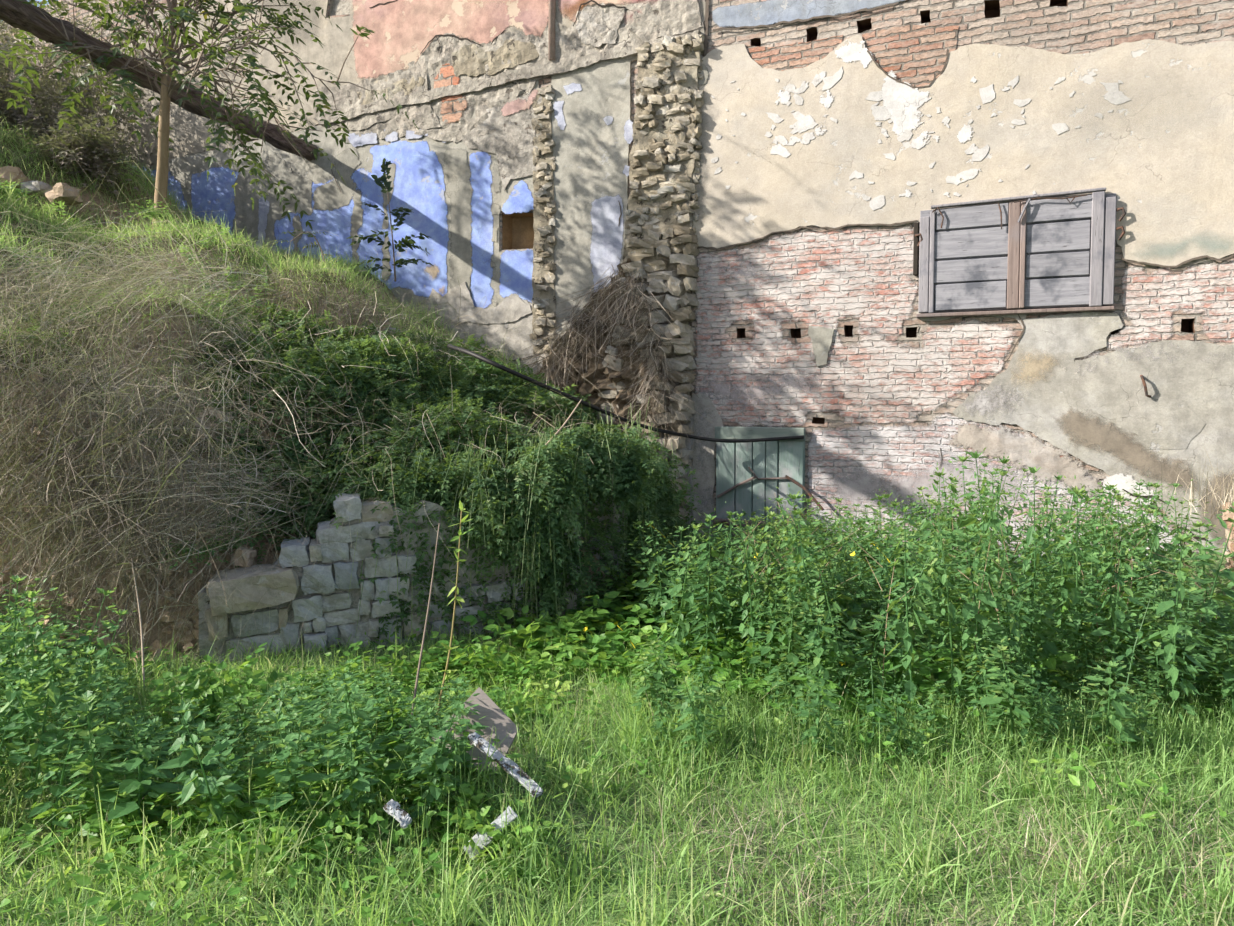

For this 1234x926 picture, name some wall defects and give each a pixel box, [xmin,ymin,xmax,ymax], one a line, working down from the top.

flaking render [576,0,702,48]
flaking render [748,24,1031,197]
peeling [849,170,917,210]
flaking render [424,265,532,324]
flaking render [1106,260,1234,350]
flaking render [695,227,1197,564]